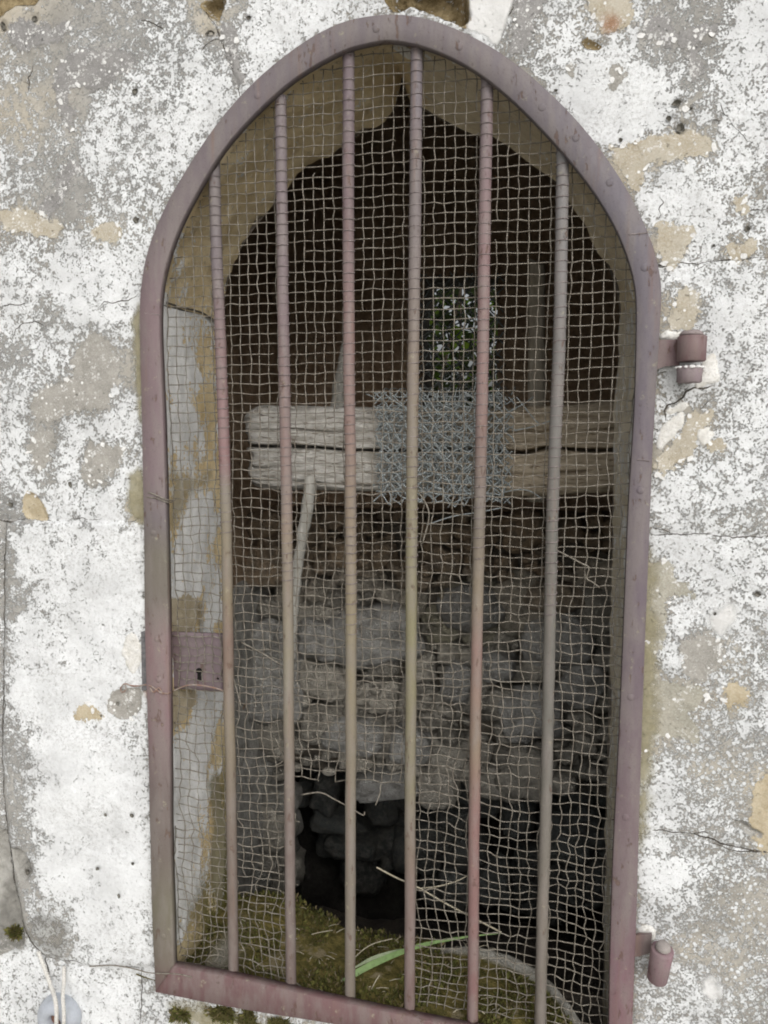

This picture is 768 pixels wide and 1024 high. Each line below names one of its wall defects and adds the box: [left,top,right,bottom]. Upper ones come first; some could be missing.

spalling [384,0,471,29]
peeling [582,0,719,194]
peeling [0,159,84,238]
peeling [88,221,123,245]
peeling [653,220,697,272]
peeling [712,194,758,265]
crack [662,386,712,420]
spalling [8,491,49,521]
peeling [644,558,752,752]
spalling [73,688,143,723]
peeling [733,771,768,855]
crack [653,829,768,853]